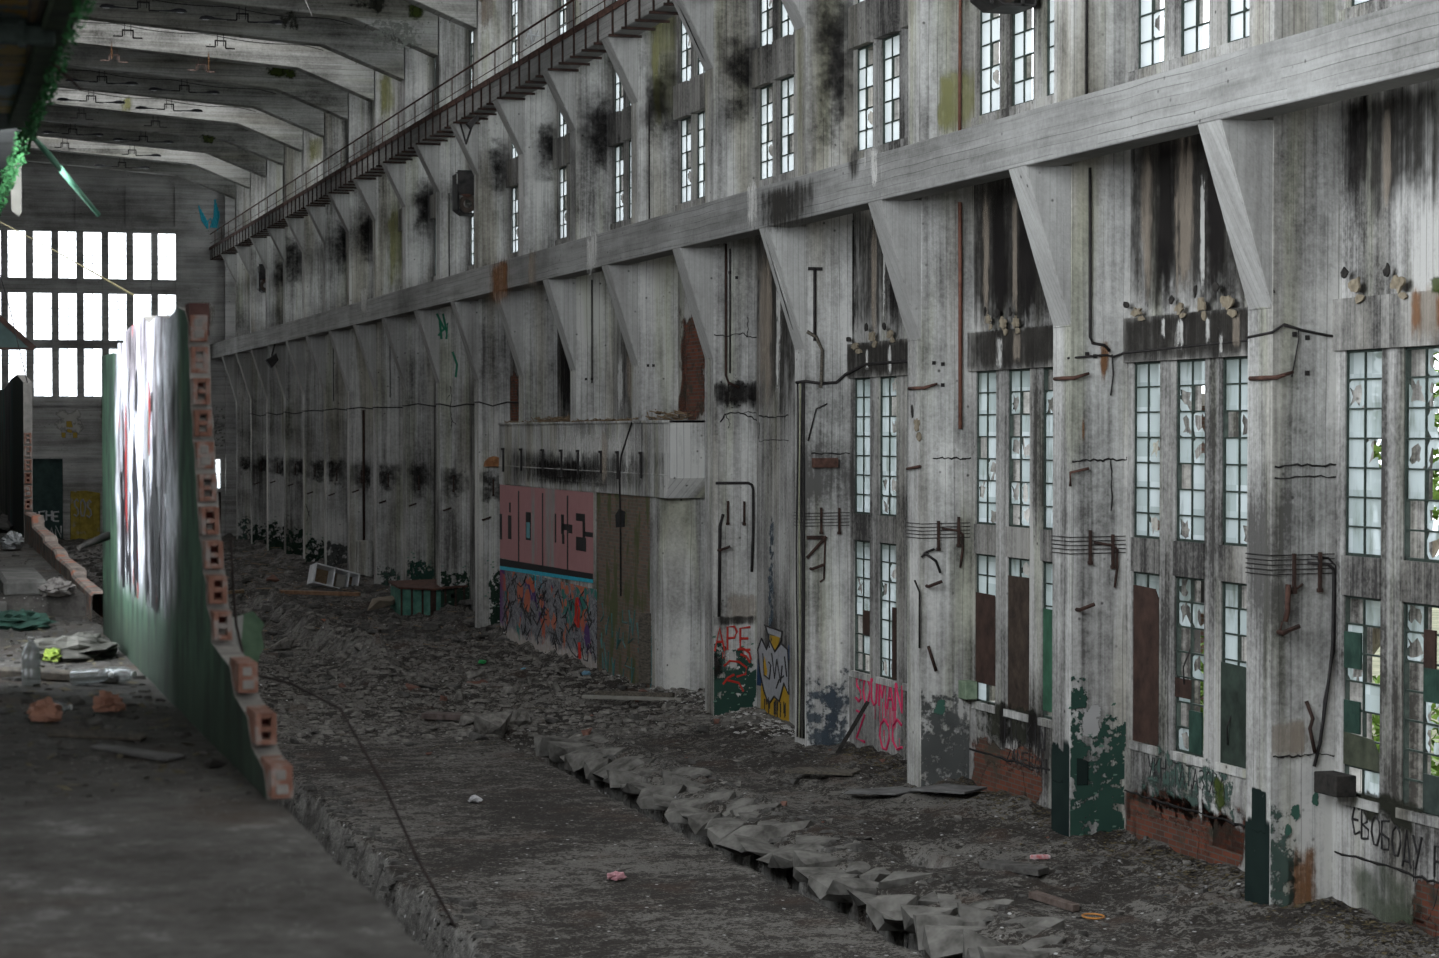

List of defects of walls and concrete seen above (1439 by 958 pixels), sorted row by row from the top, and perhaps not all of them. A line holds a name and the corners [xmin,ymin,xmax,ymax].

flaking render [678,312,705,420]
peeling [921,676,1319,907]